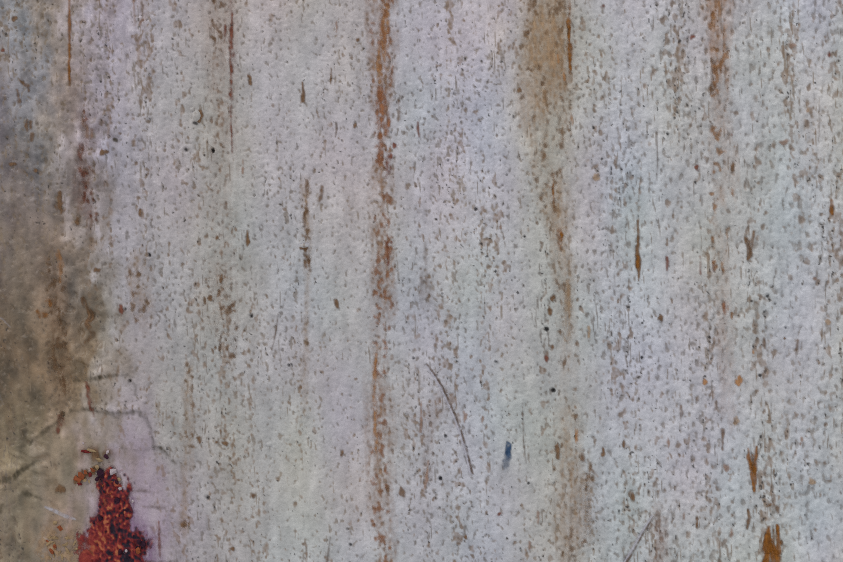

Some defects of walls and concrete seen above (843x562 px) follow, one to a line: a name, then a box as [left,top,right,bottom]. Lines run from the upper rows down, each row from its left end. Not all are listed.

rust [372,3,399,190]
rust [526,0,572,118]
rust [73,442,160,562]
rust [373,405,390,519]
rust [763,524,783,562]